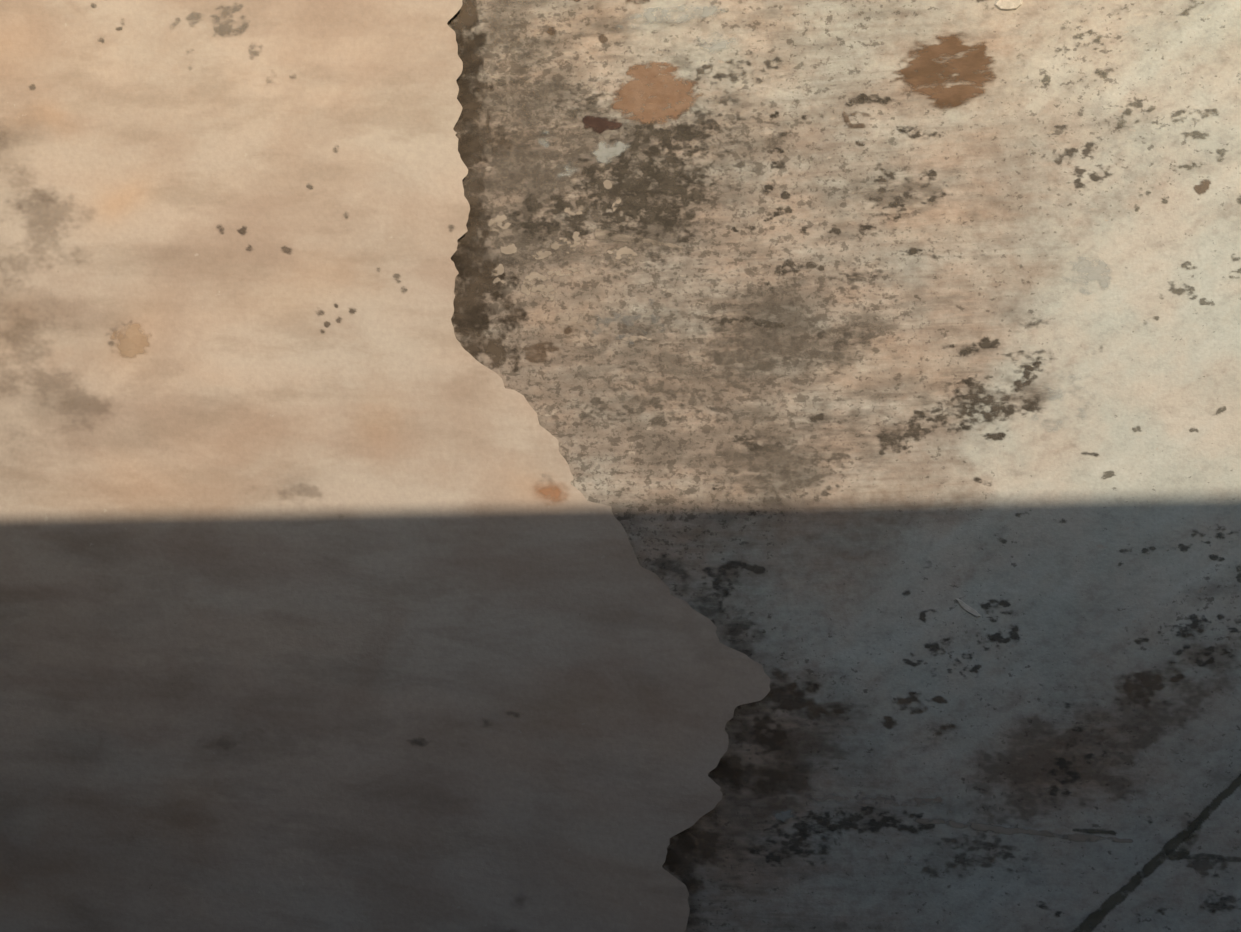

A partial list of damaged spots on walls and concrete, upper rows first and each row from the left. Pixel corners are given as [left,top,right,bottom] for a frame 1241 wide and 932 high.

rust [583,62,701,134]
mould [695,57,781,82]
rust [896,34,995,109]
damp [449,0,744,371]
peeling [447,0,1241,932]
damp [663,670,934,893]
crack [1073,774,1241,932]